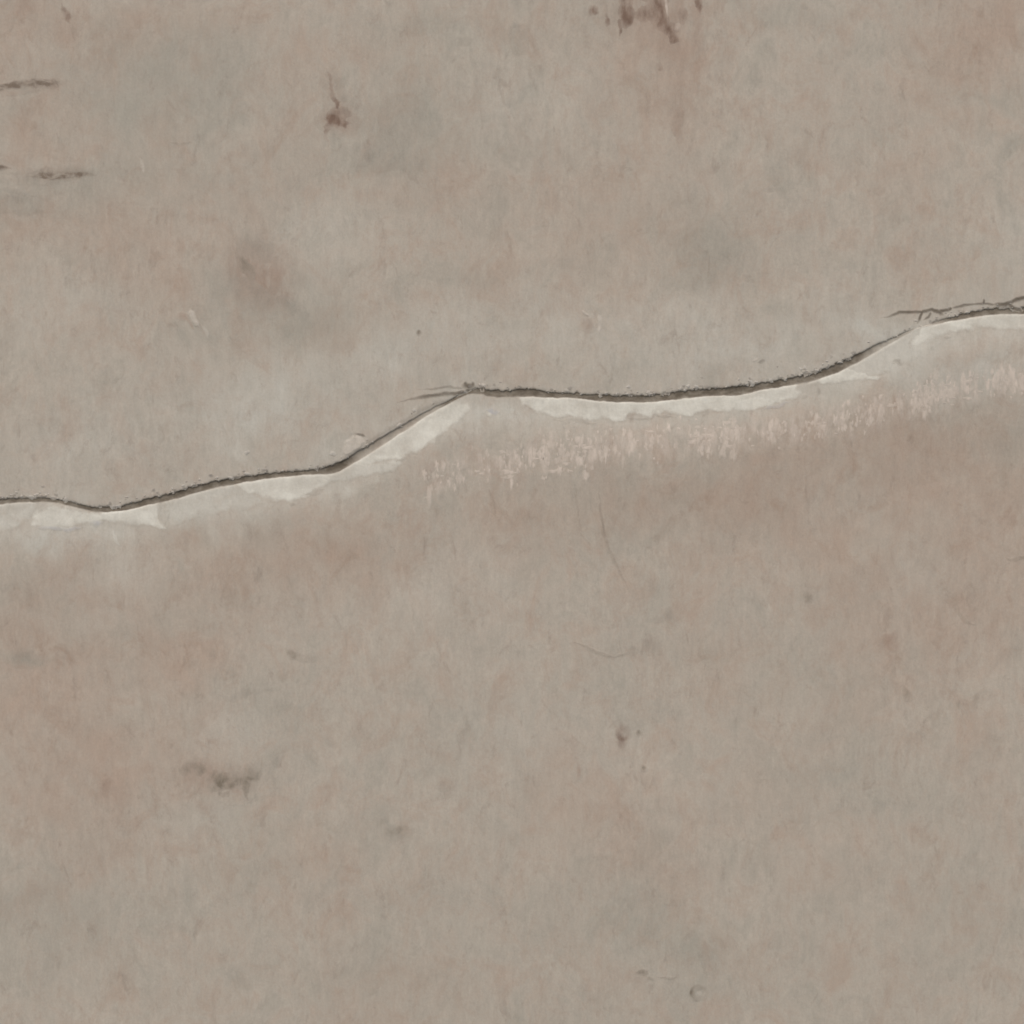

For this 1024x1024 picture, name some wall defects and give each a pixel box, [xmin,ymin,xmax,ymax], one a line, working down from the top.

crack [0,295,1024,513]